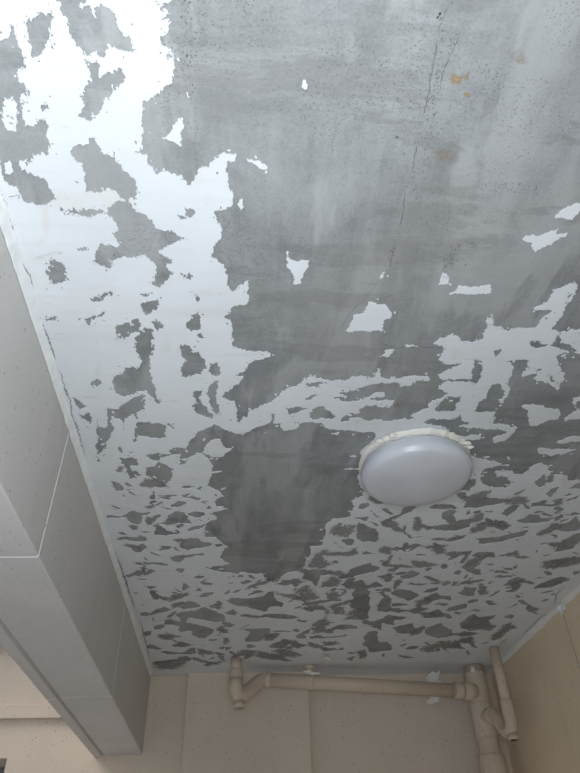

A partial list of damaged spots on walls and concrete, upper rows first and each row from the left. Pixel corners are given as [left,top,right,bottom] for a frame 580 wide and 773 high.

peeling [0,0,135,206]
crack [412,2,460,170]
peeling [45,257,69,284]
peeling [60,0,580,670]